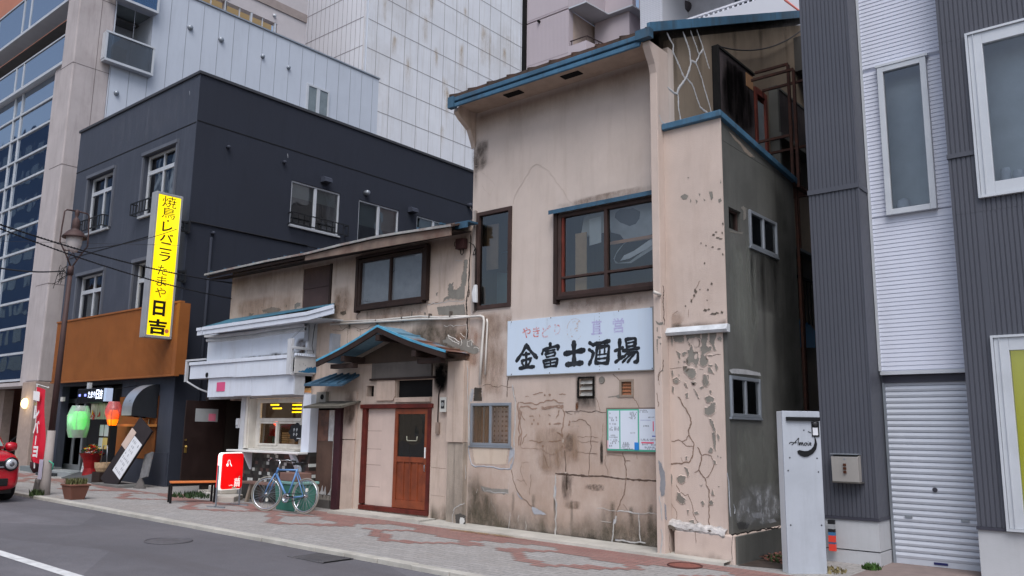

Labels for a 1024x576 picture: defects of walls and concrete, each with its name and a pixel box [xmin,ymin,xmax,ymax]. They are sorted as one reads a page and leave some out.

peeling [436,258,469,303]
crack [427,234,780,553]
peeling [656,321,723,465]